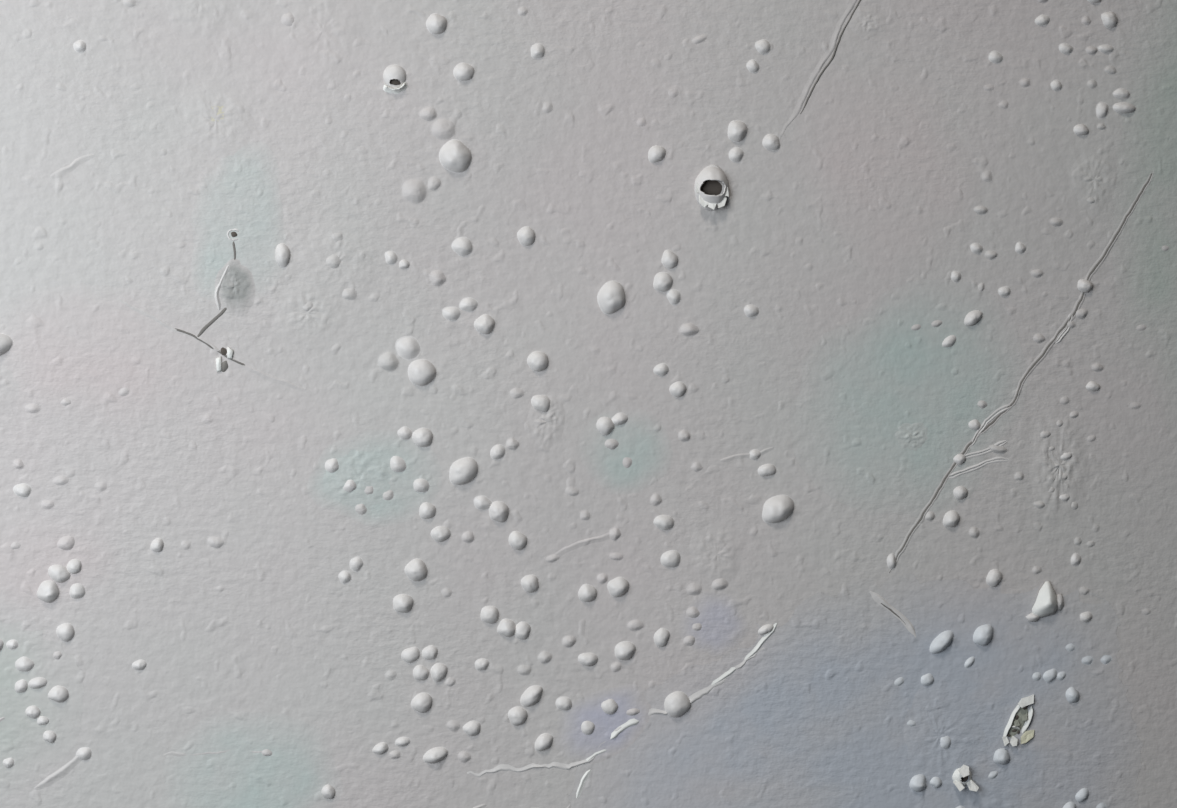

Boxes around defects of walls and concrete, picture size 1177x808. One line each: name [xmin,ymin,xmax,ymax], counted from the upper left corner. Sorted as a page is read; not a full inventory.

crack [779,0,861,140]
crack [869,171,1154,637]
peeling [1026,581,1064,622]
spalling [1002,694,1034,746]